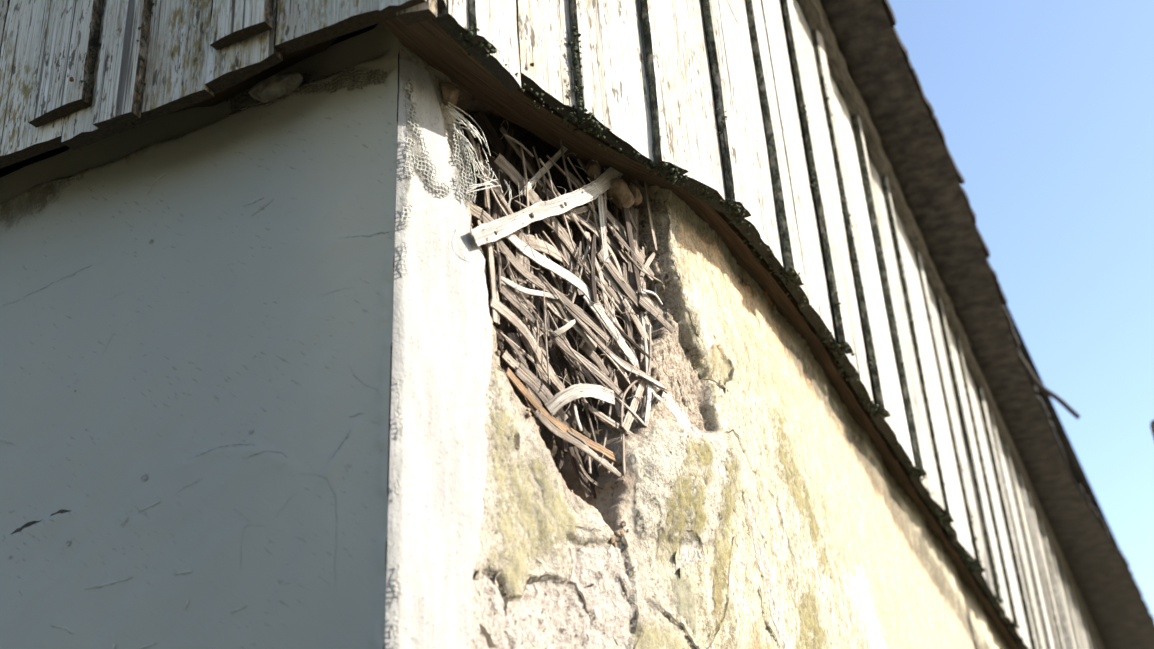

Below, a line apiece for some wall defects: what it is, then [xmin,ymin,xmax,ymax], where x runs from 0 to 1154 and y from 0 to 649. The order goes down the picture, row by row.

spalling [460,111,733,499]
crack [485,429,798,649]